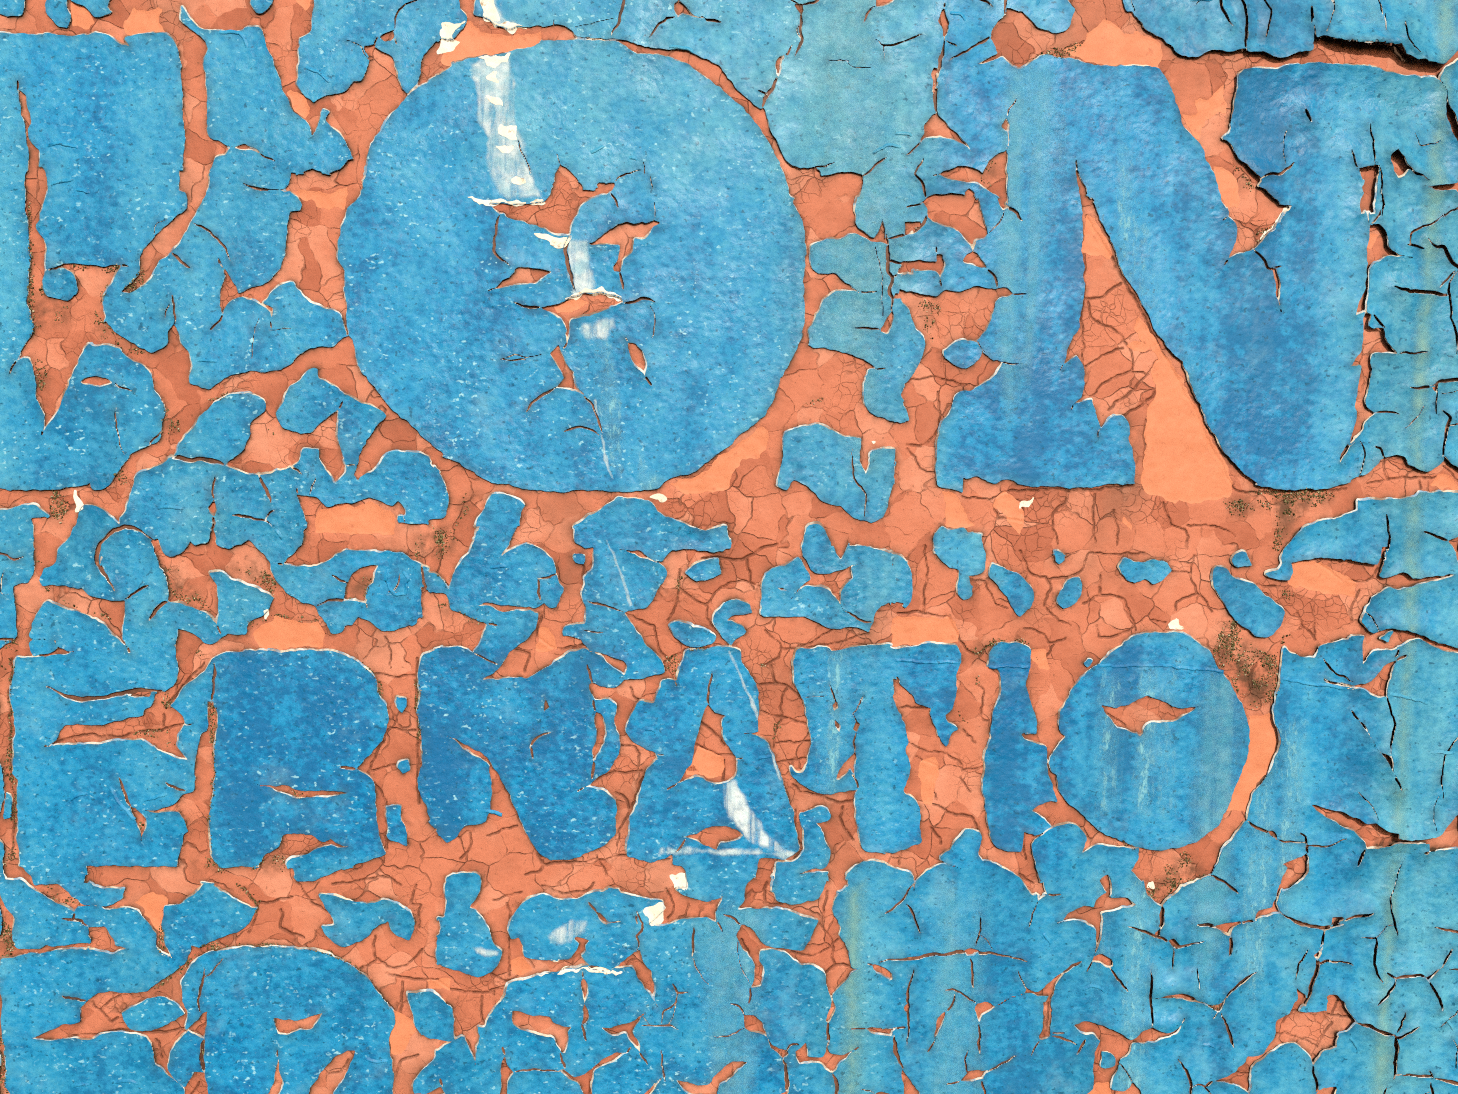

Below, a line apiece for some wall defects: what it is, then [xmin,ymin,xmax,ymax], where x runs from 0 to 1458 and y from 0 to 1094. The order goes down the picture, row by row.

crack [611,0,721,37]
crack [791,0,922,68]
crack [1377,22,1458,141]
crack [1396,182,1458,412]
peeling [0,0,491,911]
peeling [425,0,1458,1094]
crack [1379,518,1458,562]
peeling [34,495,498,1094]
peeling [0,896,126,960]
crack [880,884,1027,1043]
crack [1155,655,1458,1094]
peeling [0,994,10,1094]